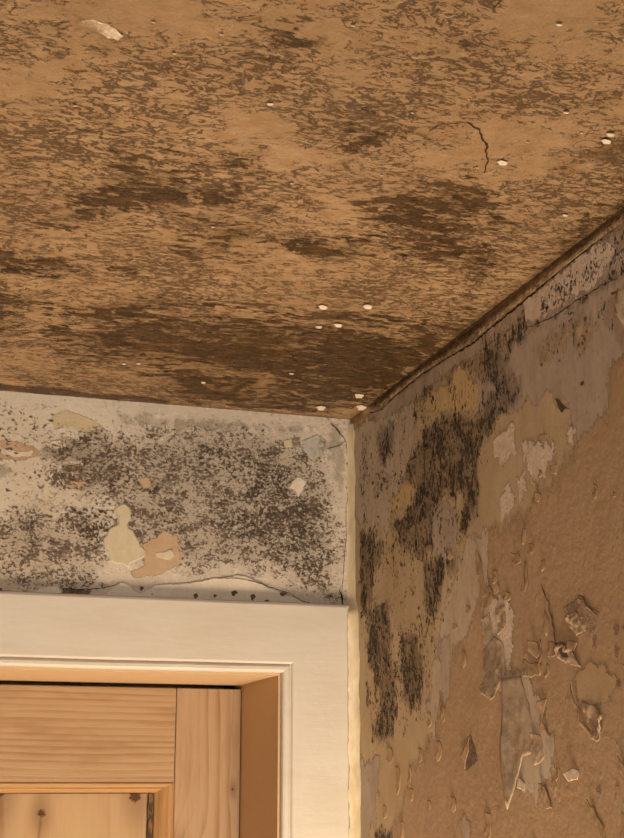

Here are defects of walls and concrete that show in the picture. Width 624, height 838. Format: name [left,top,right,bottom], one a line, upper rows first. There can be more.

peeling [77,19,126,42]
water stain [329,108,386,154]
crack [429,122,489,173]
water stain [27,149,519,287]
water stain [0,250,93,281]
water stain [0,289,484,413]
peeling [0,438,88,490]
water stain [0,402,345,603]
peeling [290,477,306,497]
water stain [358,360,522,742]
peeling [354,224,624,838]
flaking render [62,584,117,594]